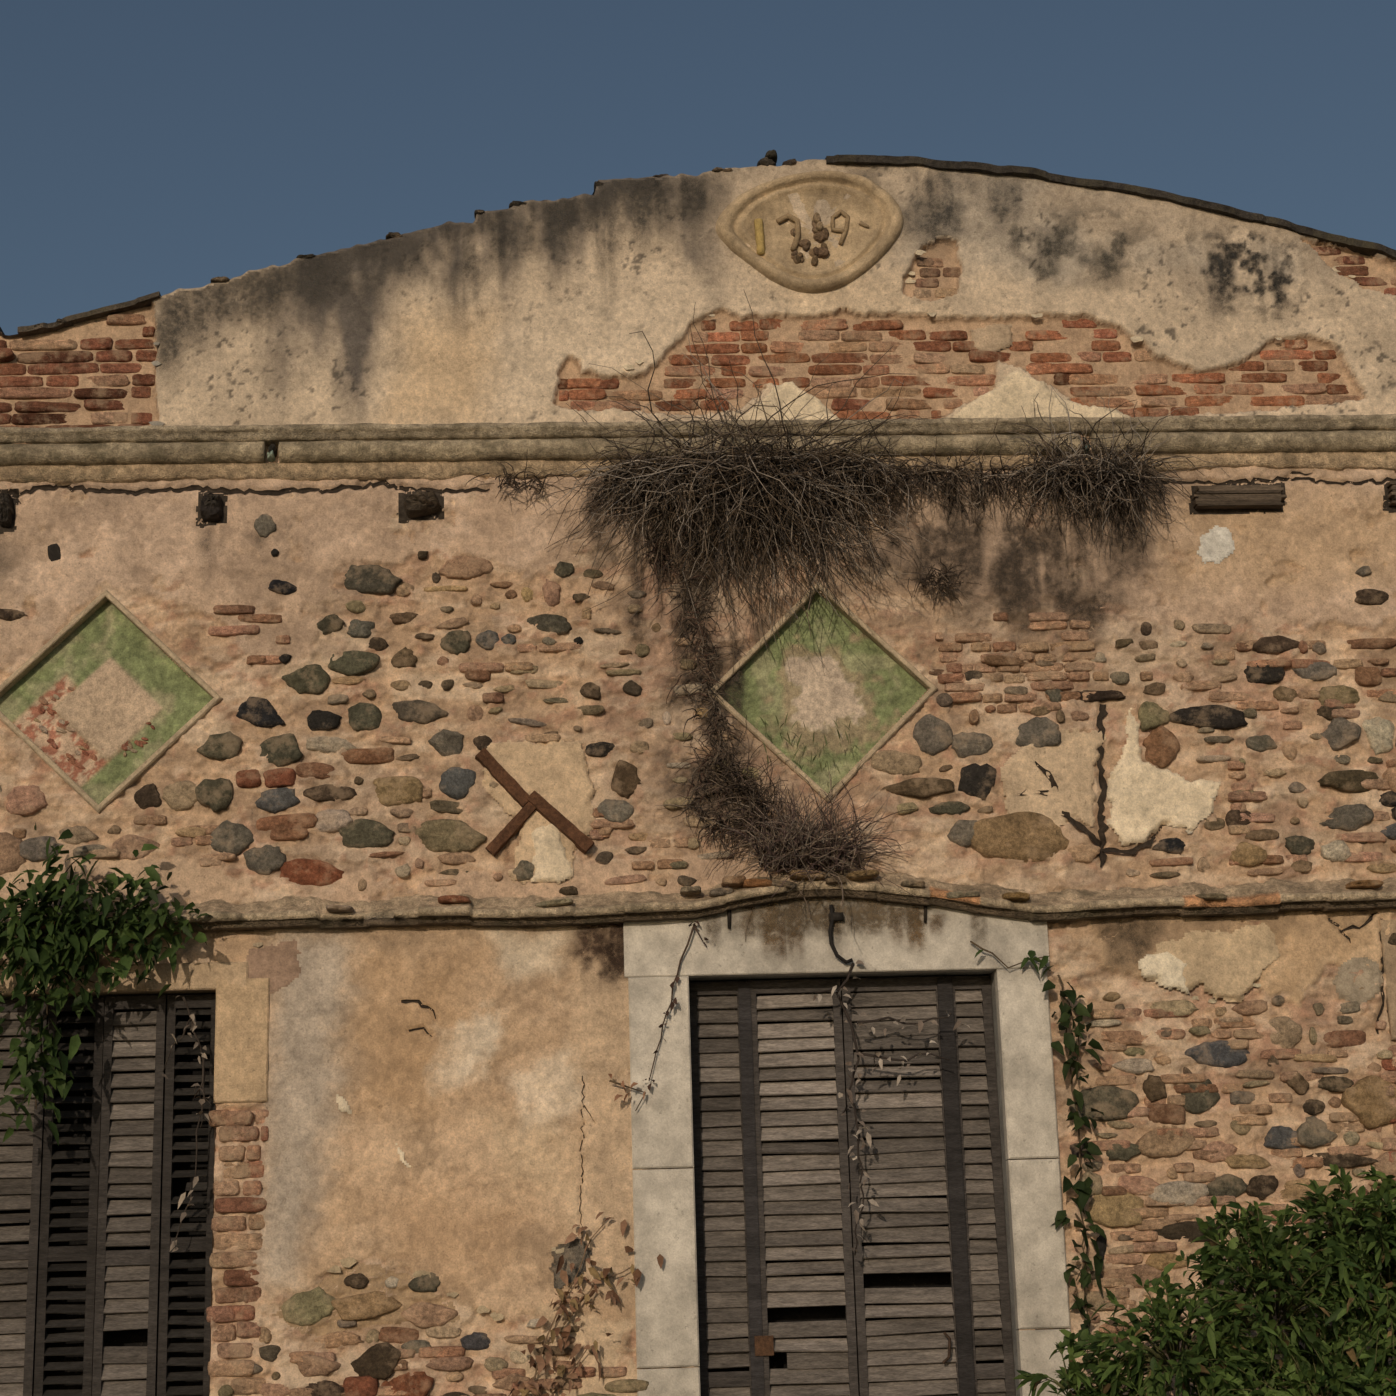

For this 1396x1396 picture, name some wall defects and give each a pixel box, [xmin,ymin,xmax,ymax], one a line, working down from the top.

spalling [0,304,165,444]
leakage [163,245,420,351]
spalling [554,238,1365,436]
leakage [1204,234,1293,304]
crack [7,480,490,504]
leakage [867,481,1158,627]
leakage [629,501,791,754]
crack [1019,704,1164,868]
crack [401,999,436,1037]
flaking render [1138,923,1281,1004]